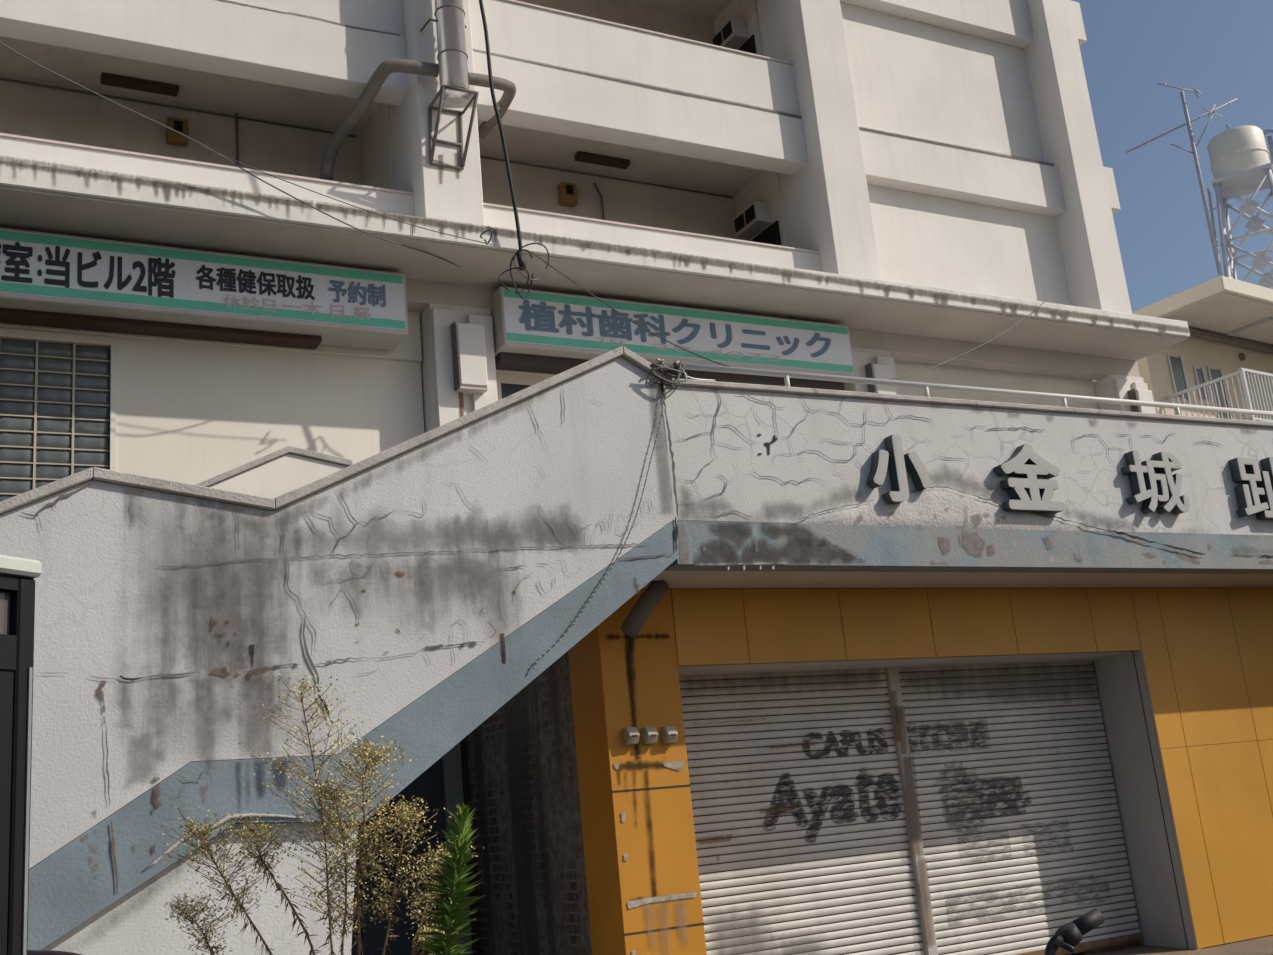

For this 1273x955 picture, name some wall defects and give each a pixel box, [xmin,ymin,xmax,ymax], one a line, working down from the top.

damp [860,127,1054,166]
damp [0,156,1190,341]
crack [159,380,1273,753]
damp [694,507,855,570]
peeling [933,531,996,563]
crack [49,672,195,681]
crack [105,721,118,893]